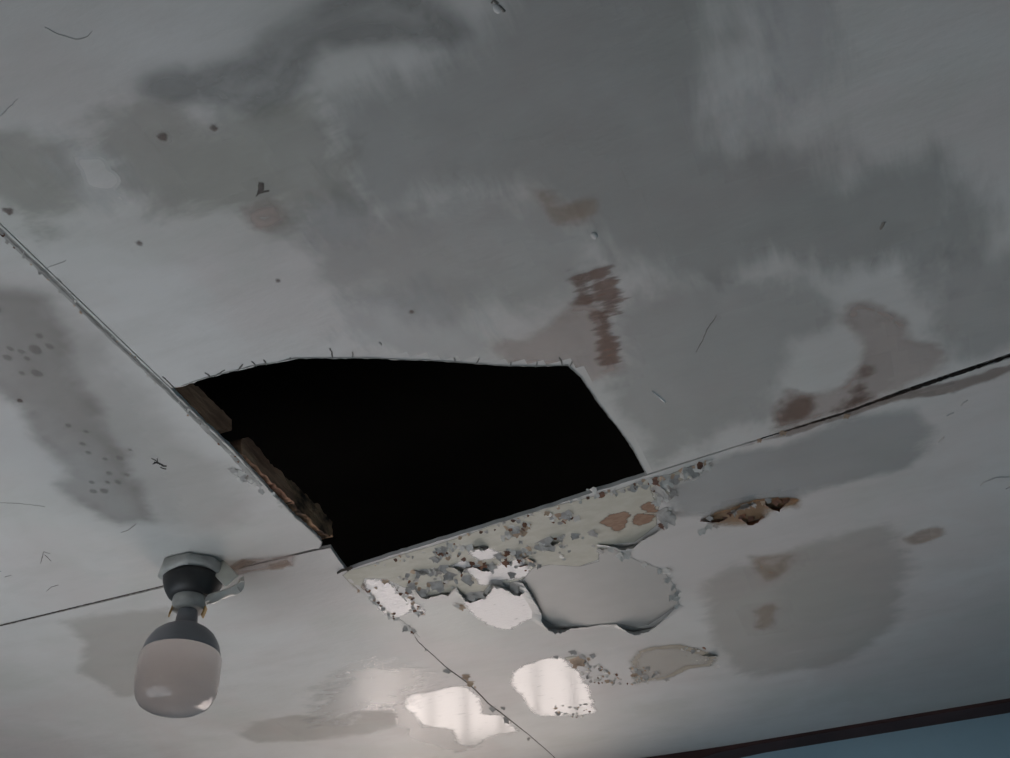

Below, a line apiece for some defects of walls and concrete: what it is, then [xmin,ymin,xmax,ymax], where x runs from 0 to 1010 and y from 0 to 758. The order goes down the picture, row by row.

corrosion [571,267,622,371]
corrosion [777,398,817,422]
peeling [697,497,798,536]
peeling [343,460,713,635]
peeling [553,650,628,686]
peeling [553,703,591,718]